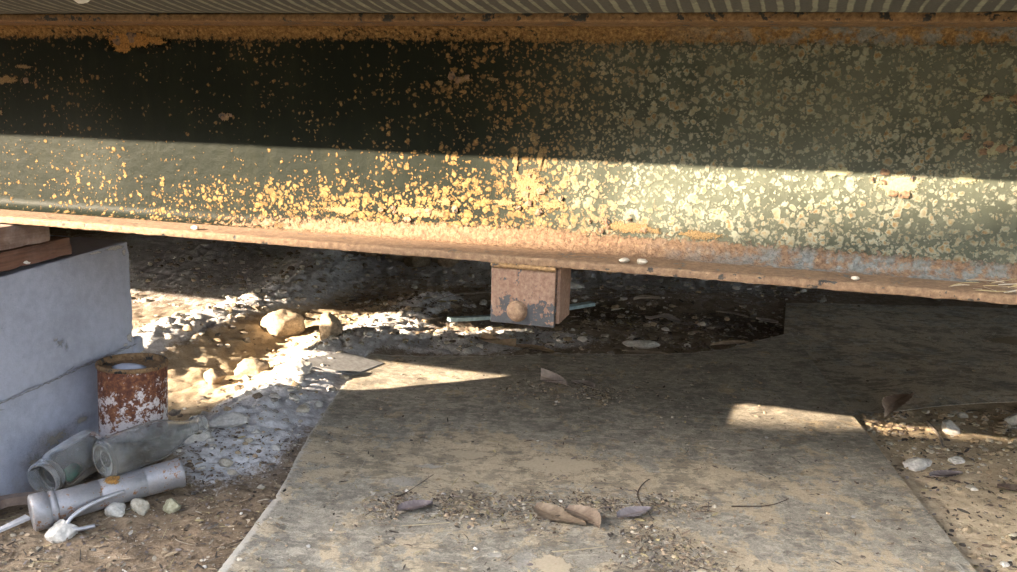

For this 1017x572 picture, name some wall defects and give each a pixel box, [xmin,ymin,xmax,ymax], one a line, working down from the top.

rust [103,32,167,54]